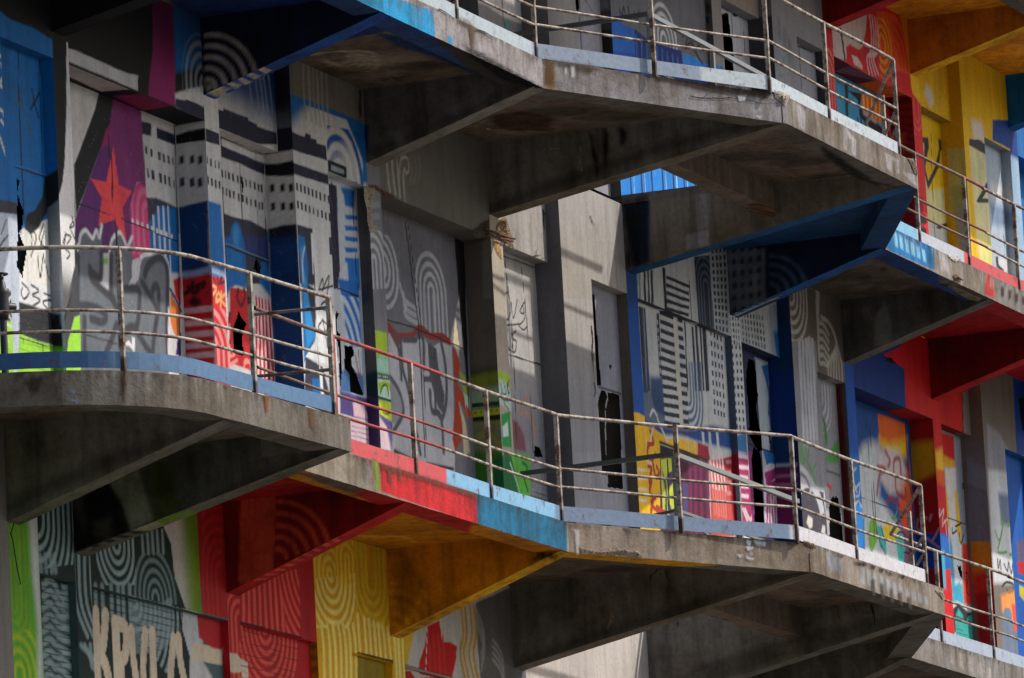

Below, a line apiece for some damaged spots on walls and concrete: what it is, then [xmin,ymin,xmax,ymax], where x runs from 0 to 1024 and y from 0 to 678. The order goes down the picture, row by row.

spalling [364,186,380,233]
spalling [472,217,516,259]